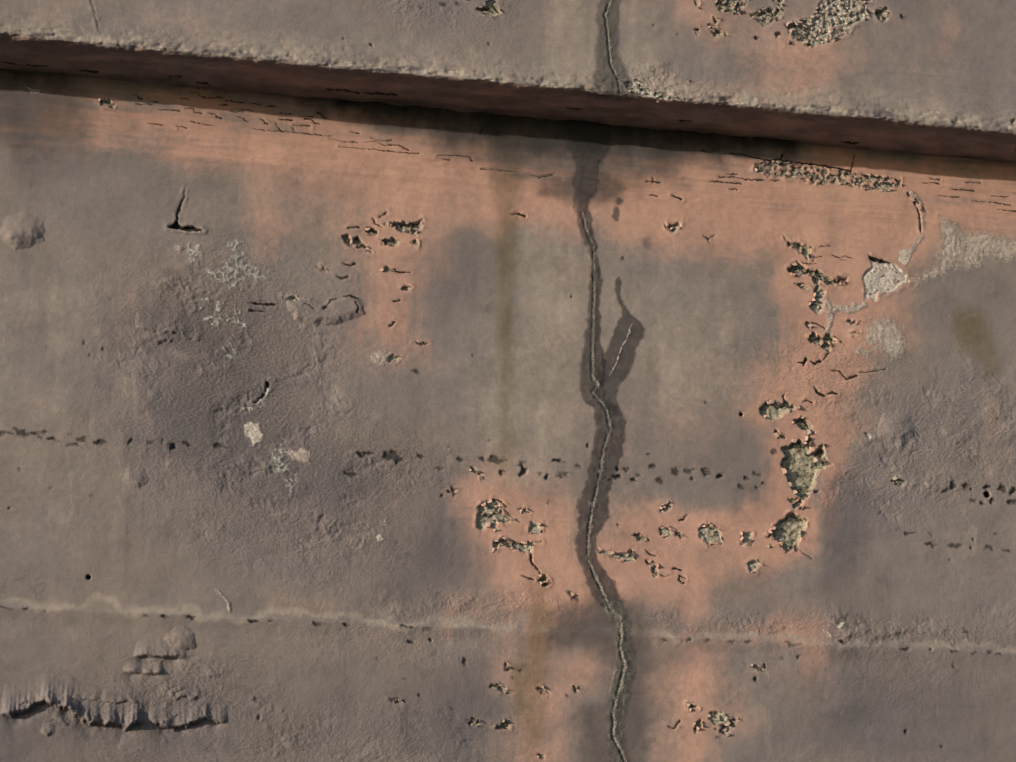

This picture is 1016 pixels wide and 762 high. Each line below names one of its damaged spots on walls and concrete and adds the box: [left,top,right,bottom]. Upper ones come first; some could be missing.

crack [604,0,641,94]
peeling [695,0,905,48]
crack [168,195,202,233]
peeling [342,212,423,251]
peeling [755,160,924,301]
water stain [913,218,1016,287]
peeling [784,238,847,363]
water stain [856,319,906,359]
spalling [740,395,831,559]
spalling [477,499,552,587]
peeling [597,514,687,584]
peeling [693,711,738,737]